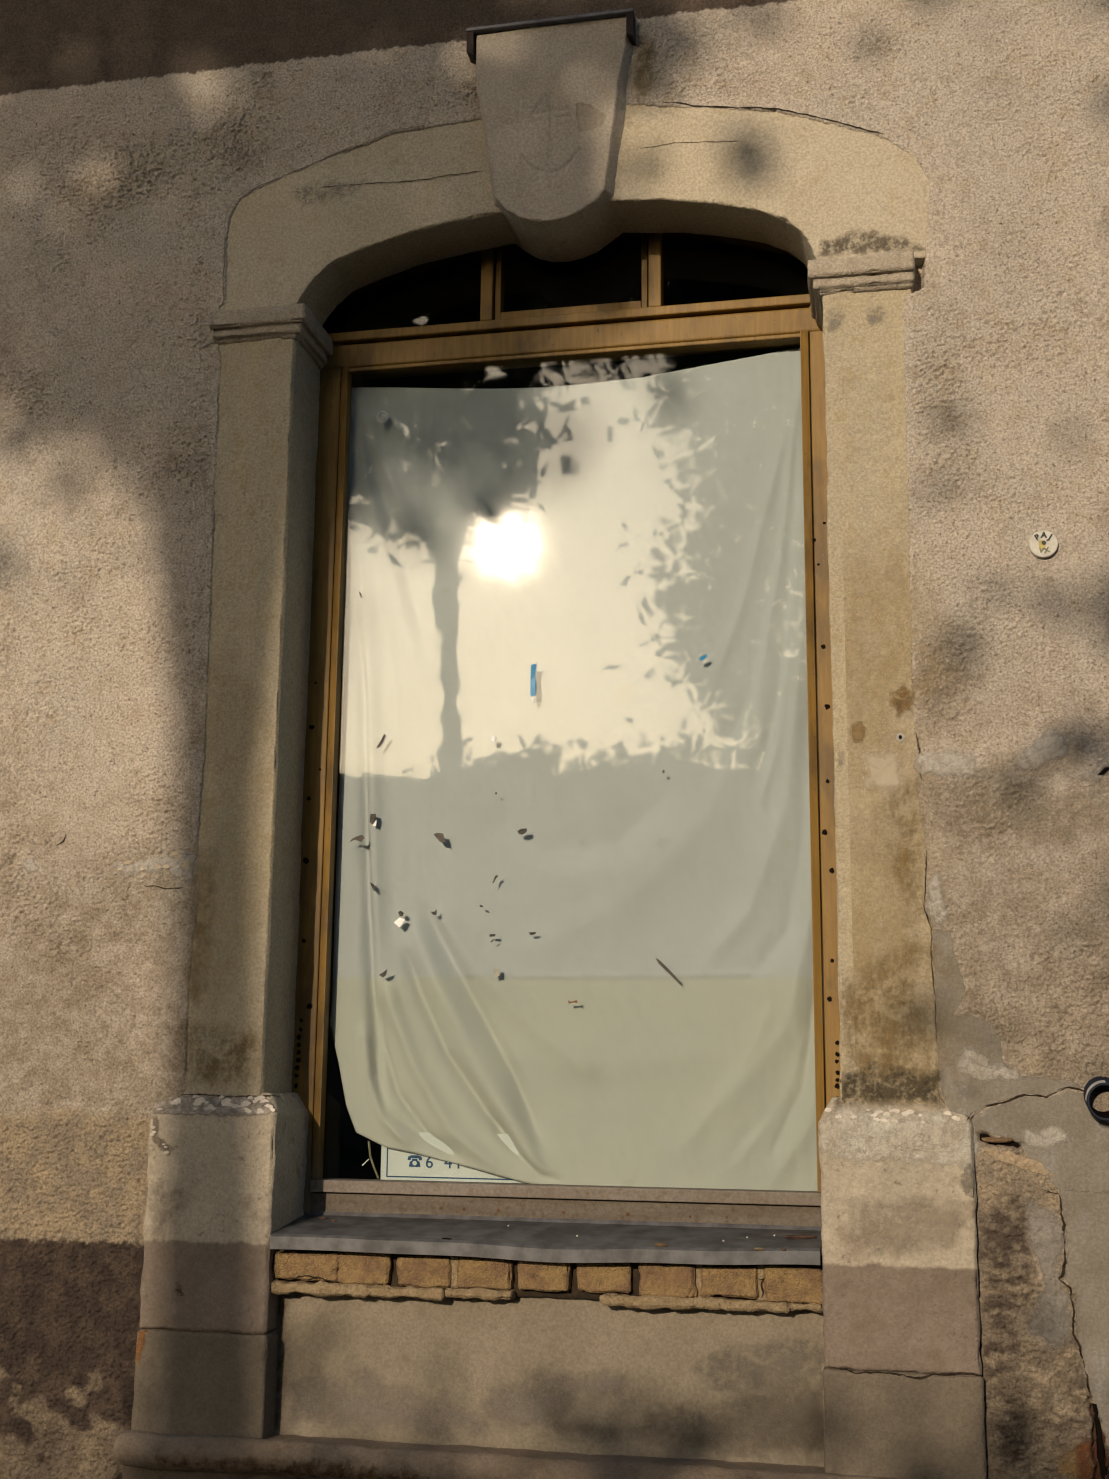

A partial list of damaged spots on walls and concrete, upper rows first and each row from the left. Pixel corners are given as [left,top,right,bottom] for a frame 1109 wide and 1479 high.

crack [221,125,478,307]
leakage [852,722,864,741]
leakage [838,951,939,1103]
crack [967,1086,1084,1120]
crack [1042,1189,1091,1395]
spalling [1090,1403,1109,1479]